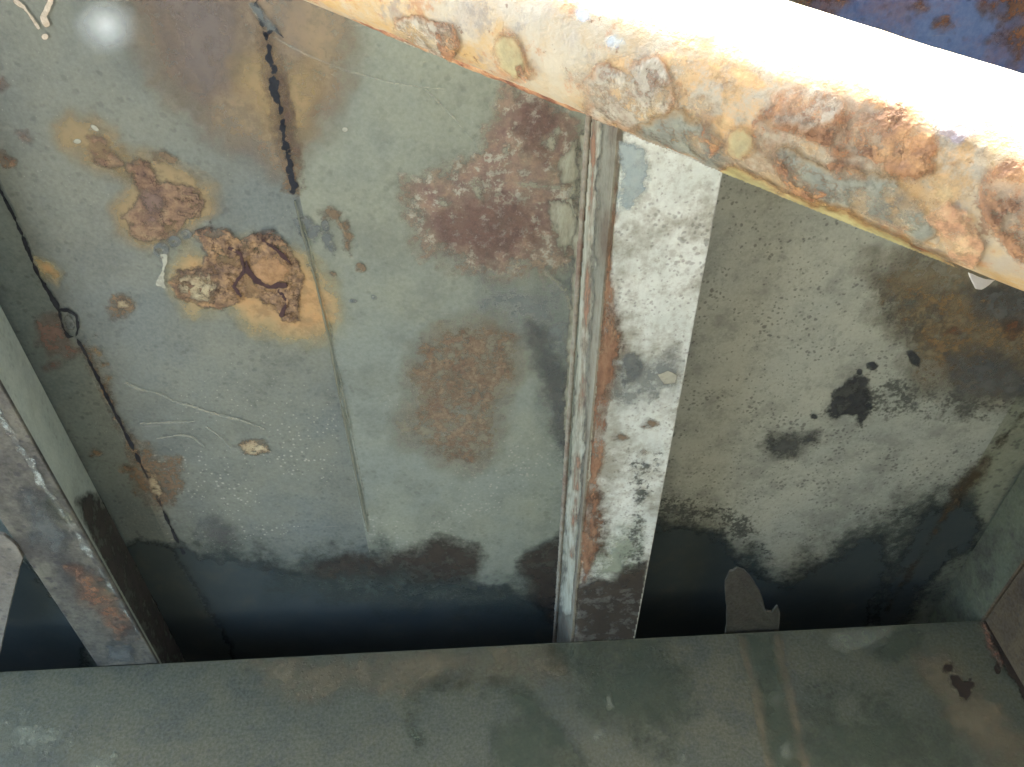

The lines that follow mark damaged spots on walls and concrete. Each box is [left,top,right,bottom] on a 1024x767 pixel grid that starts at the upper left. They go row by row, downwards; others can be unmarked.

crack [0,189,185,555]
corrosion [119,442,185,507]
corrosion [56,115,357,340]
peeling [238,440,270,456]
crack [249,0,368,532]
leakage [77,493,559,663]
corrosion [135,0,1024,420]
corrosion [580,248,624,583]
leakage [572,453,983,767]